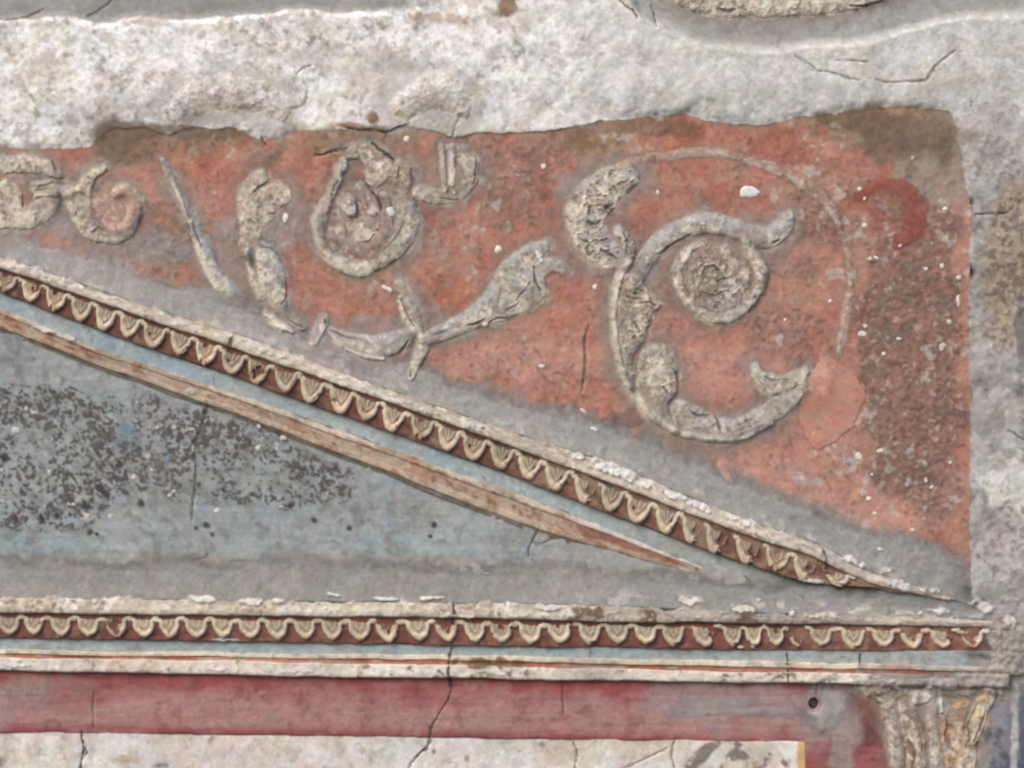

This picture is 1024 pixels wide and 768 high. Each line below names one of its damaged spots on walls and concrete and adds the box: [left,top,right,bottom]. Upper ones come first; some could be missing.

crack [80,732,88,768]
crack [409,602,456,768]